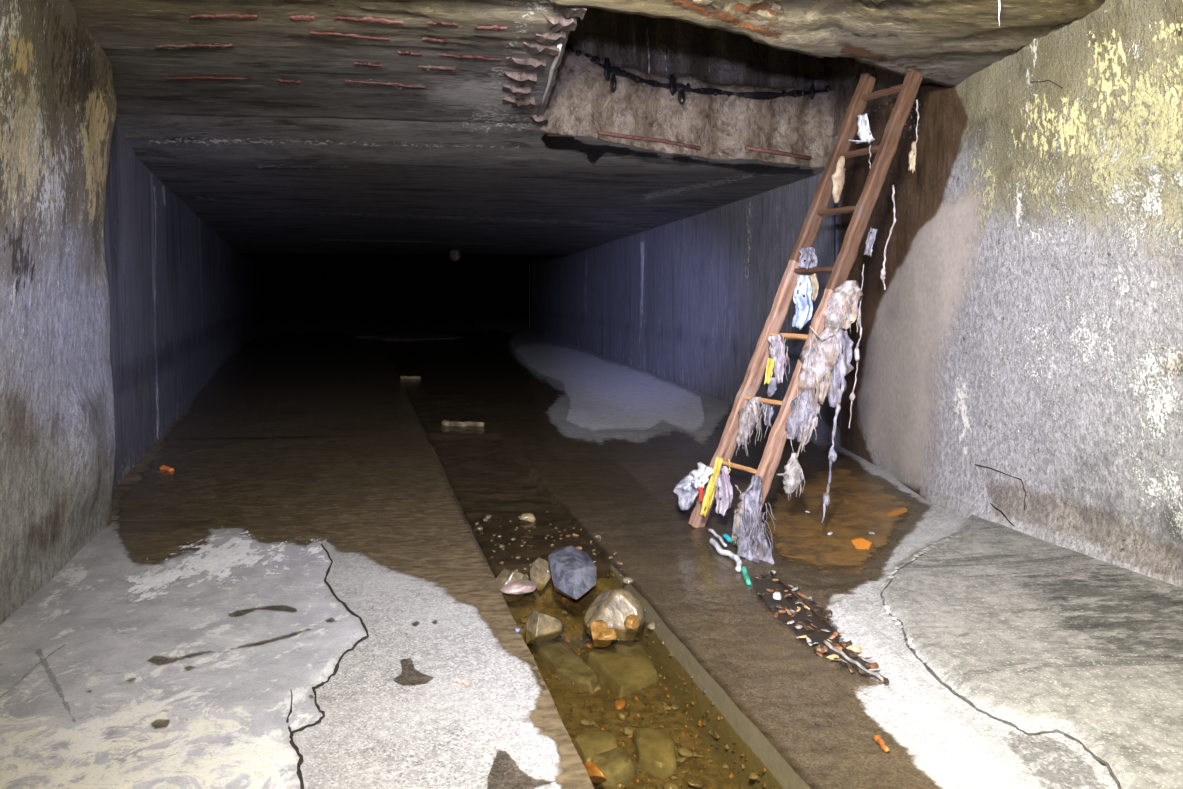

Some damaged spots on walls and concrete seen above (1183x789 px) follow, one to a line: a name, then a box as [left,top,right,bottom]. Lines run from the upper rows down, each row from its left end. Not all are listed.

water stain [0,16,33,77]
water stain [26,74,116,240]
spalling [597,131,701,150]
spalling [745,146,811,160]
water stain [1011,28,1140,161]
water stain [1149,11,1183,114]
water stain [1012,180,1067,251]
crack [286,543,369,789]
crack [880,534,1122,789]